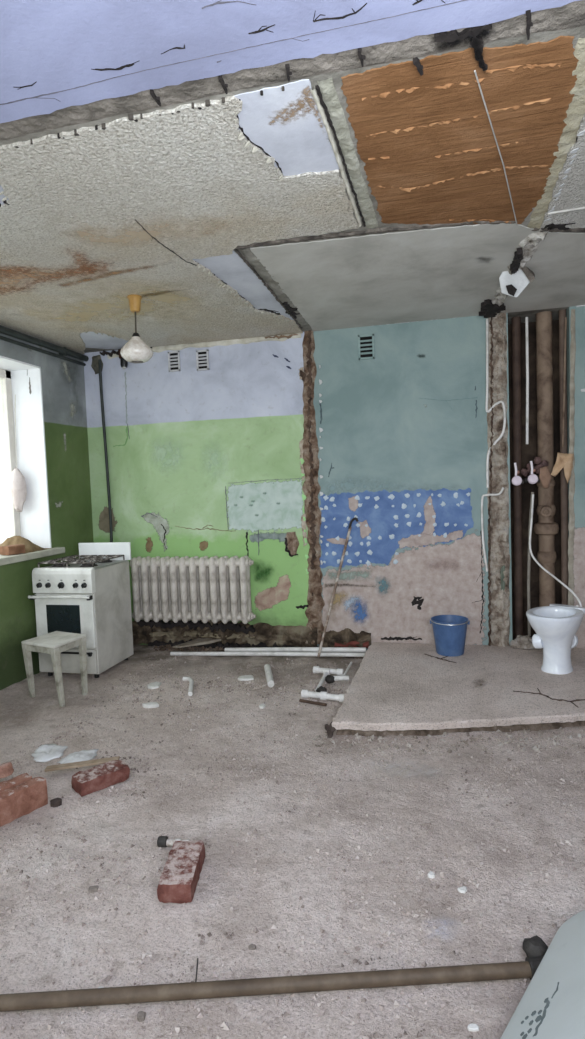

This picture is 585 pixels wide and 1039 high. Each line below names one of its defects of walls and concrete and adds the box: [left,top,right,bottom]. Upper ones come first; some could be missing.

crack [525,10,533,40]
crack [0,0,466,173]
peeling [159,79,340,181]
crack [135,219,281,315]
peeling [150,250,301,353]
peeling [98,506,117,533]
flaking render [132,438,487,649]
crack [513,688,585,708]